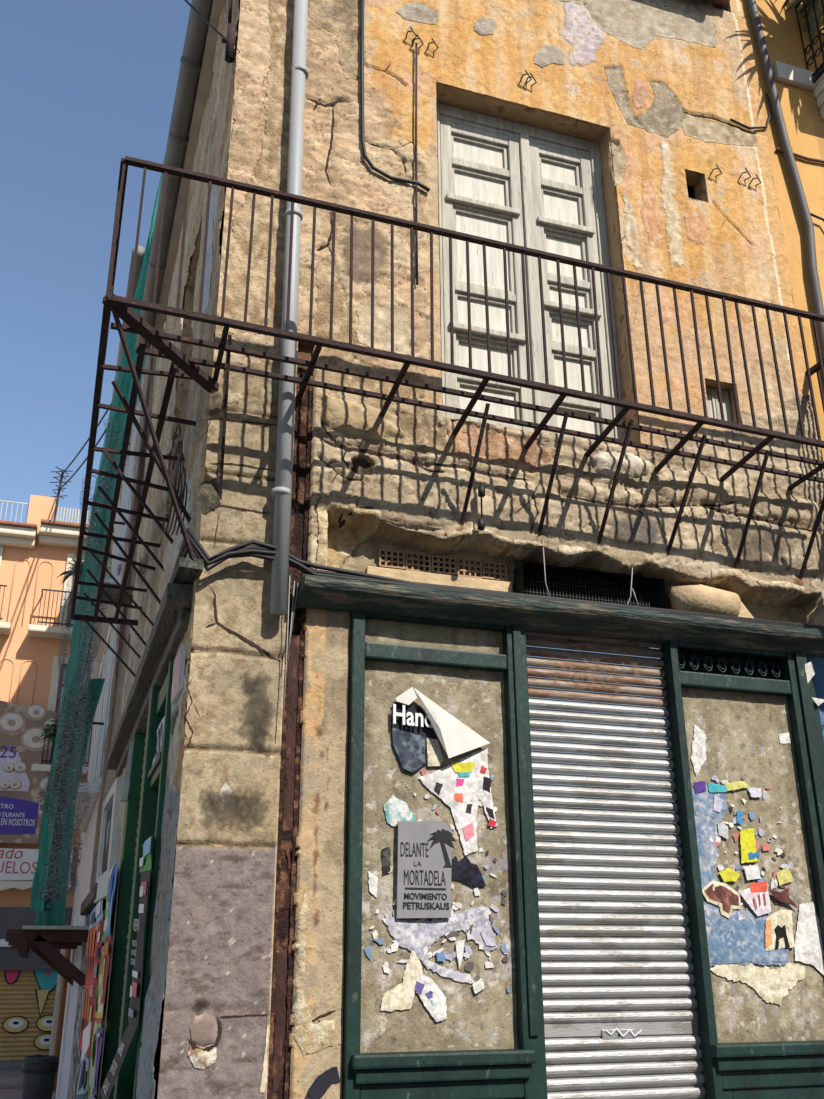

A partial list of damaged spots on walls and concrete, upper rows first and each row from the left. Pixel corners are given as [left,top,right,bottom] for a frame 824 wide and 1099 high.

peeling [559,0,758,146]
crack [307,98,346,186]
crack [366,141,413,173]
spalling [316,503,381,572]
crack [316,421,539,531]
spalling [381,408,556,473]
spalling [442,528,648,575]
crack [563,495,813,531]
spalling [707,568,805,606]
crack [205,588,281,662]
rust [282,635,301,830]
rust [273,948,288,1091]